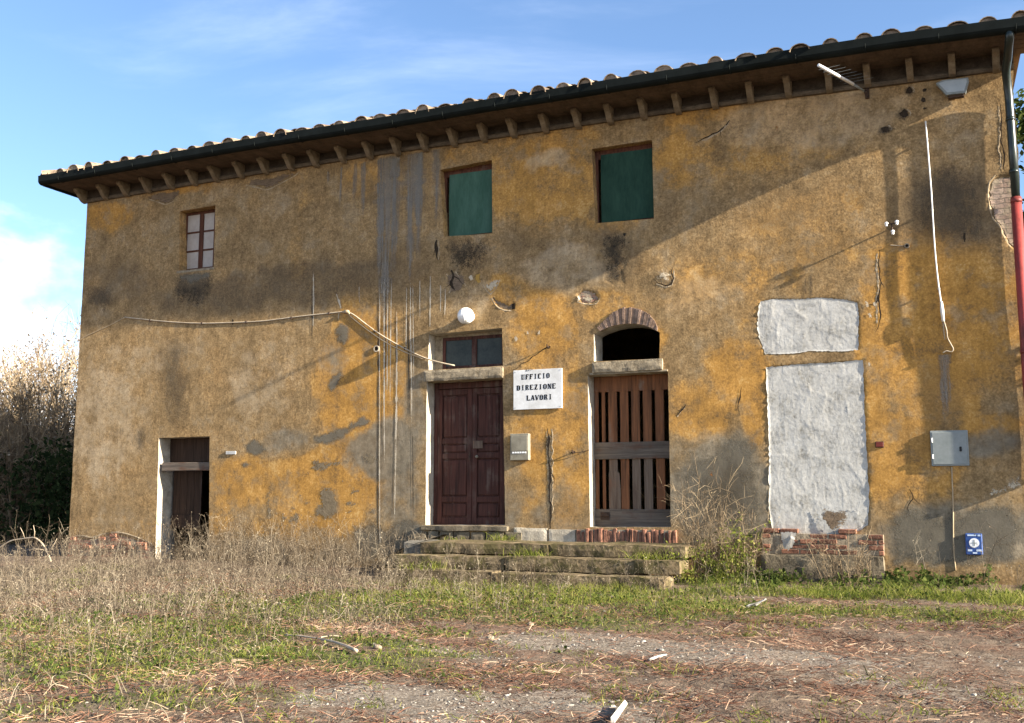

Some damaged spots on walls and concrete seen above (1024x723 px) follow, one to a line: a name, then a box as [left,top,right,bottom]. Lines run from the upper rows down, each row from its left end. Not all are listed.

crack [695,120,730,143]
flaking render [987,175,1013,247]
flaking render [491,297,515,311]
flaking render [577,291,600,305]
crack [869,250,883,330]
peeling [335,324,349,345]
damp [354,150,446,558]
peeling [314,417,370,444]
peeling [242,439,266,467]
peeling [308,454,378,474]
crack [546,428,555,529]
peeling [266,480,370,523]